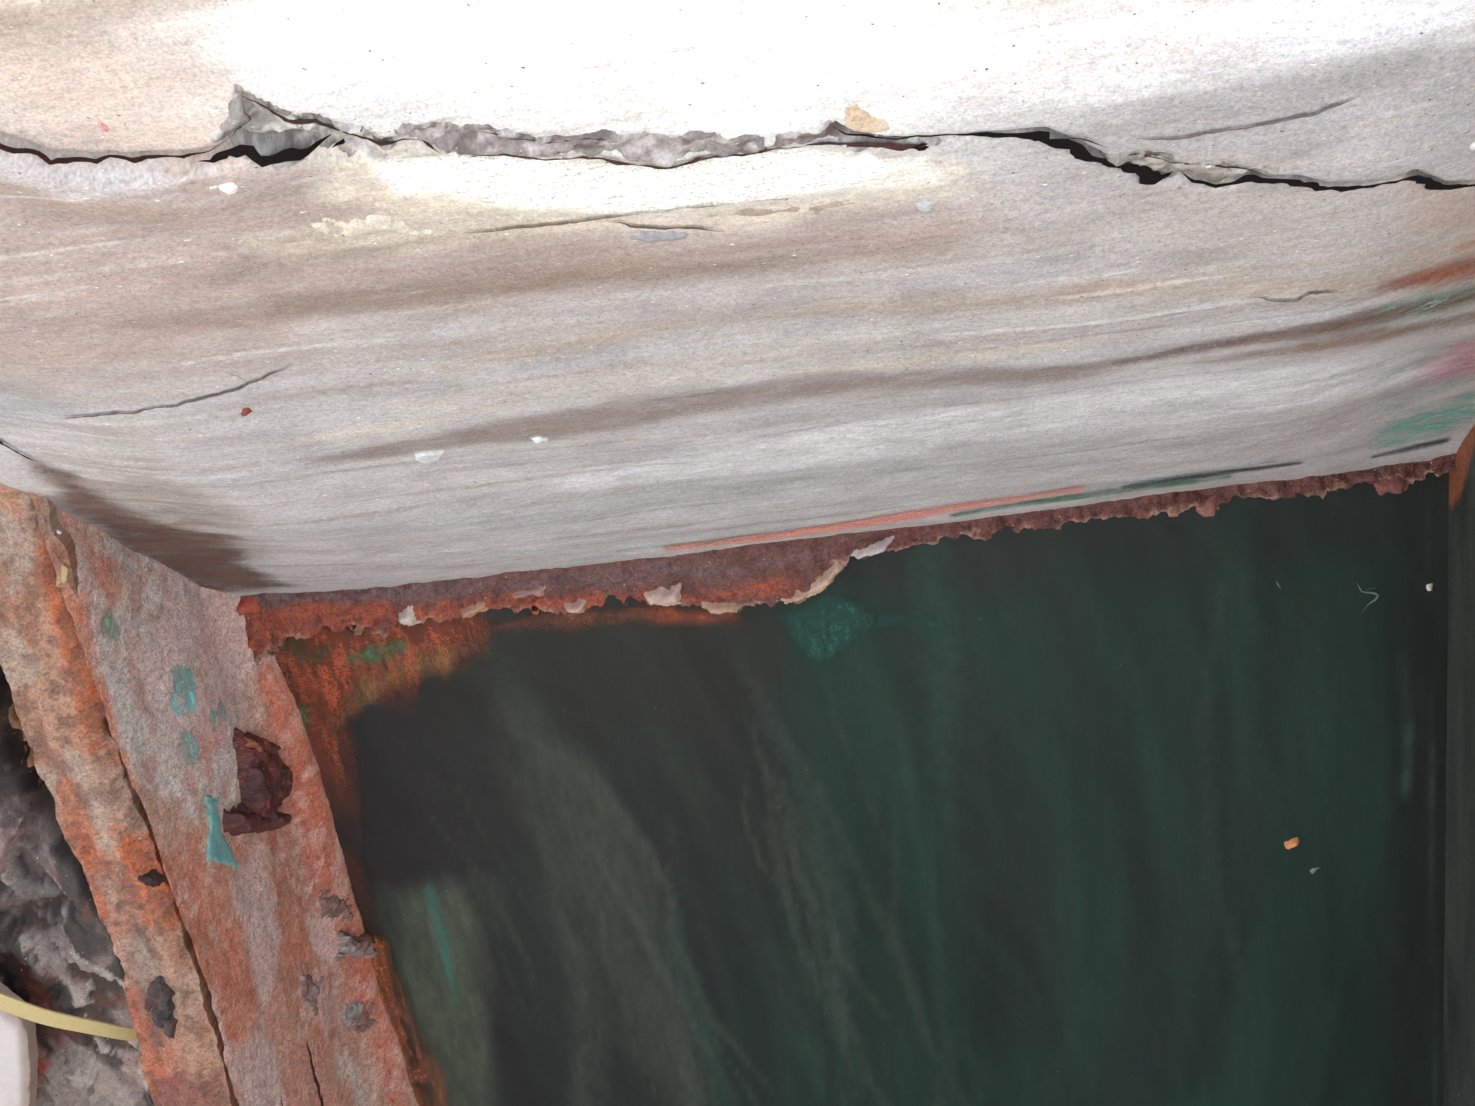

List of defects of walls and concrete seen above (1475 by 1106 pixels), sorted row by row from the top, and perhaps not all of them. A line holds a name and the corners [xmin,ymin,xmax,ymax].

crack [0,95,1475,192]
crack [468,198,788,233]
rust [1195,495,1219,517]
rust [1373,475,1410,496]
rust [35,465,285,616]
rust [777,536,894,604]
rust [138,868,167,887]
rust [144,975,178,1039]
rust [300,974,325,1018]
rust [318,889,447,1106]